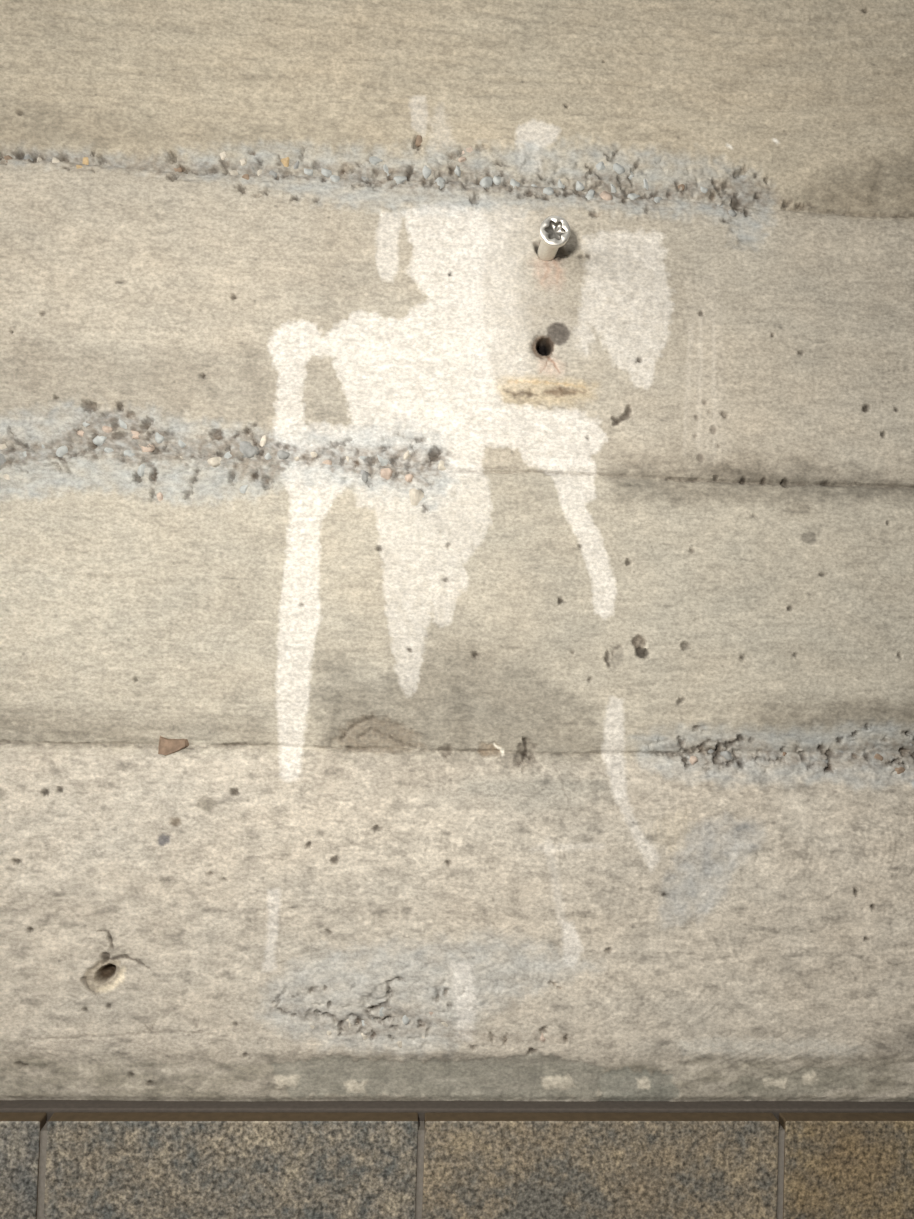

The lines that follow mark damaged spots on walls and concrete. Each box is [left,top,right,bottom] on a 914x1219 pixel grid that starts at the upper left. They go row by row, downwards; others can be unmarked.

water stain [372,211,406,285]
water stain [443,209,606,402]
water stain [0,460,663,875]
water stain [527,835,606,931]